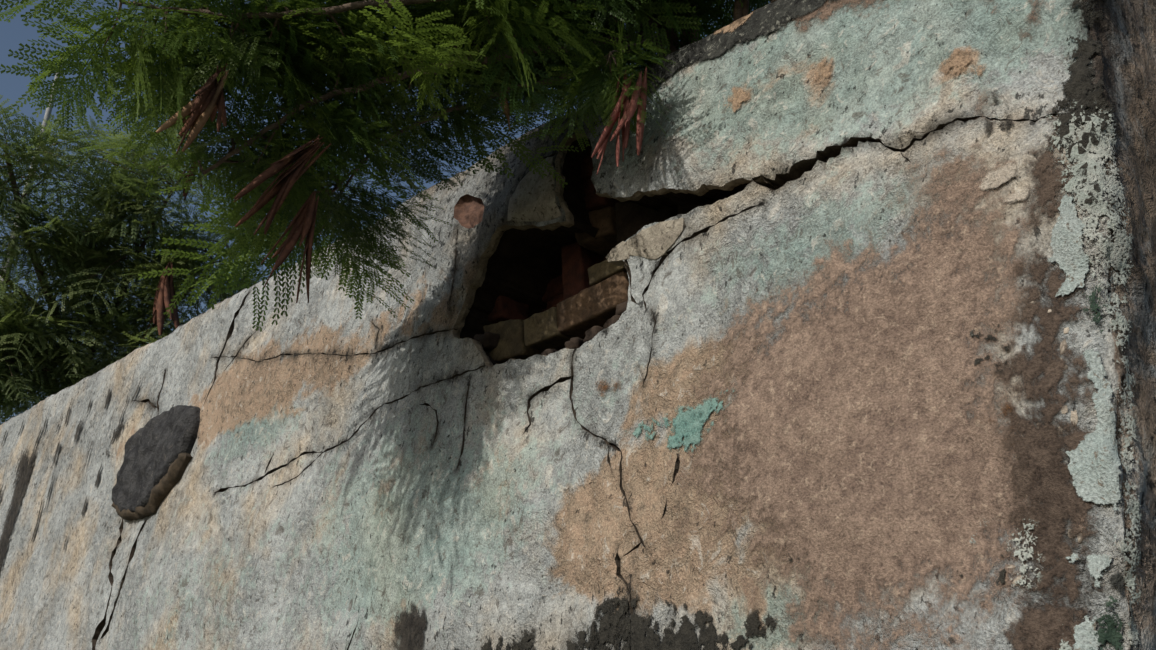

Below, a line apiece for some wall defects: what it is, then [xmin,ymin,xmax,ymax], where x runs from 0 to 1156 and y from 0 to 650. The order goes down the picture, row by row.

crack [204,228,458,403]
spalling [454,194,484,229]
flaking render [483,148,718,363]
crack [624,113,1061,388]
leakage [0,399,91,571]
leakage [82,380,141,516]
crack [215,365,485,493]
crack [523,348,680,614]
crack [92,518,146,650]
leakage [392,603,427,650]
leakage [480,588,776,650]